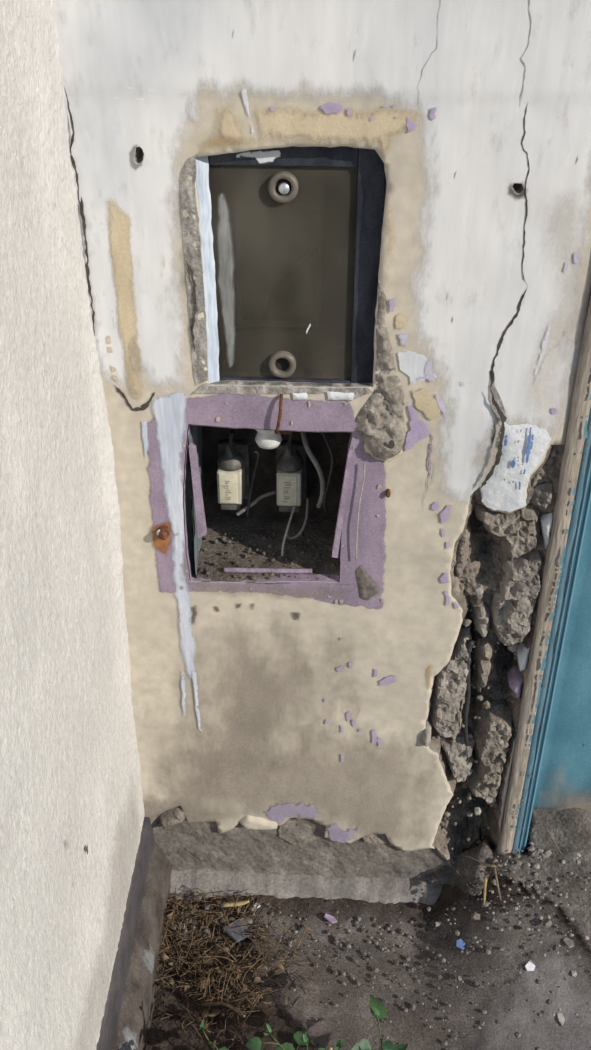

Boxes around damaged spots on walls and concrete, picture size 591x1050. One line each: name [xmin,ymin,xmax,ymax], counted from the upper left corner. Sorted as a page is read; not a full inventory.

crack [64,87,95,336]
crack [480,0,532,489]
crack [115,386,155,411]
rust [152,523,171,553]
spalling [152,445,569,880]